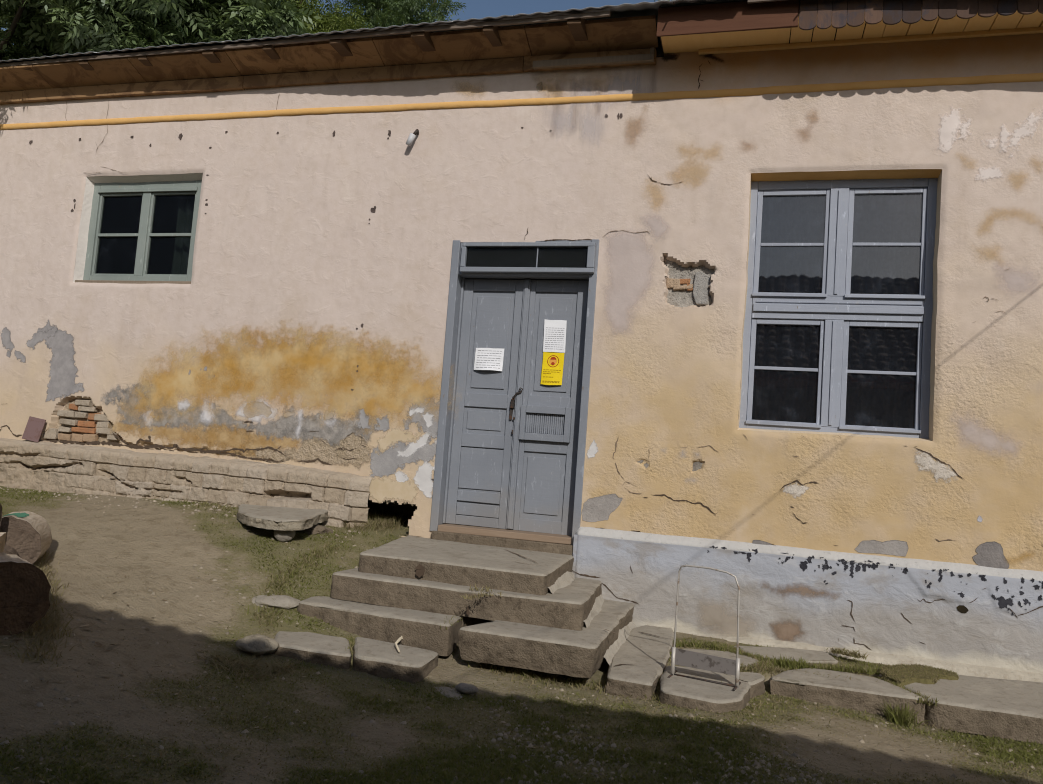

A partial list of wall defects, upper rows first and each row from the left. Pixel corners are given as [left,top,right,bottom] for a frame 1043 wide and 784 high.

peeling [939,108,971,152]
peeling [982,113,1042,157]
spalling [666,259,714,307]
spalling [1,320,122,443]
damp [101,329,441,458]
peeling [256,397,440,503]
spalling [915,451,957,480]
spalling [783,483,809,498]
peeling [778,552,908,585]
peeling [925,569,1043,616]